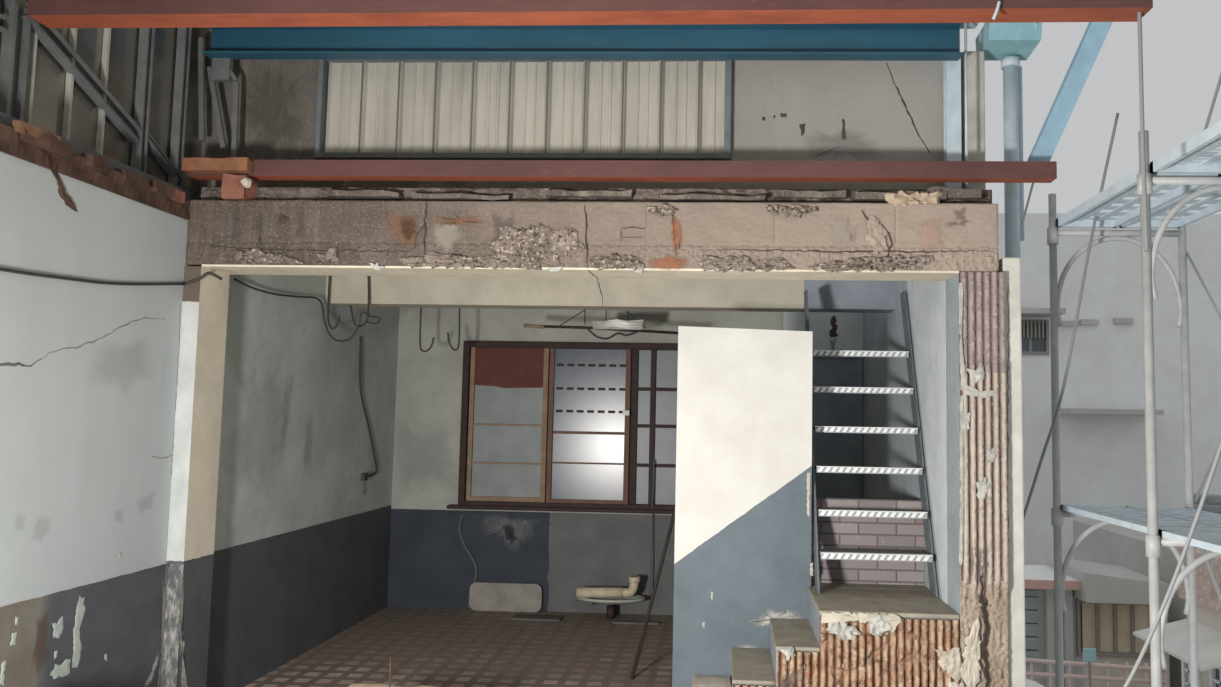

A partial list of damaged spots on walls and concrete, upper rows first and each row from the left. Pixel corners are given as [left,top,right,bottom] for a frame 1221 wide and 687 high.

crack [886,63,930,154]
spalling [201,187,224,200]
spalling [256,187,992,274]
corrosion [653,220,683,269]
crack [0,309,180,410]
spalling [959,283,998,565]
crack [1004,283,1012,556]
peeling [486,515,531,549]
peeling [50,596,85,679]
spalling [733,612,981,687]
crack [979,575,1009,687]